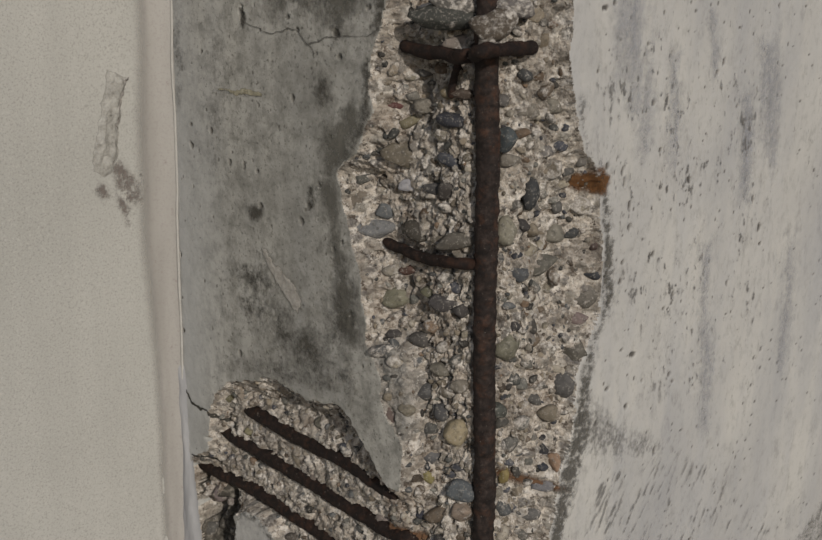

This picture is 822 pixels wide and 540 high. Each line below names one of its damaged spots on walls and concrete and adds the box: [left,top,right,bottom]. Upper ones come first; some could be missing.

crack [243,19,382,54]
rust [569,168,610,194]
water stain [249,206,262,220]
water stain [309,63,372,343]
spalling [191,0,605,540]
water stain [277,314,320,365]
crack [186,390,238,431]
rust [495,468,543,485]